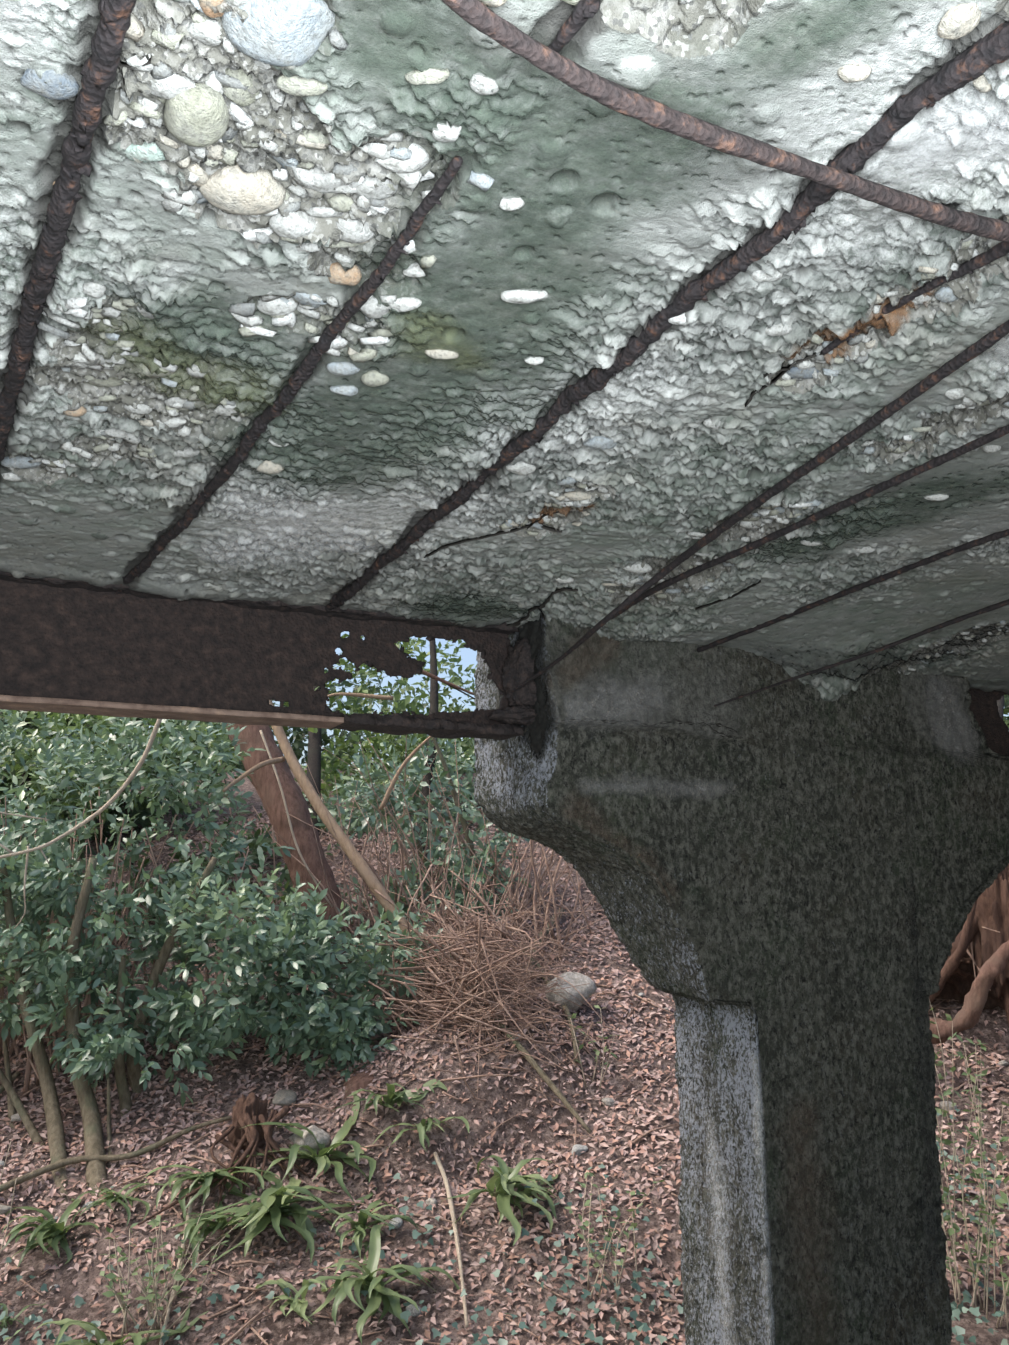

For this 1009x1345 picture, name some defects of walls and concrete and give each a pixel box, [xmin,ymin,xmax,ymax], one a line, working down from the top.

spalling [0,0,525,595]
spalling [326,0,1009,610]
corrosion [790,292,930,358]
crack [745,352,822,407]
spalling [510,320,1009,707]
corrosion [324,661,384,713]
corrosion [400,637,426,679]
corrosion [452,636,506,696]